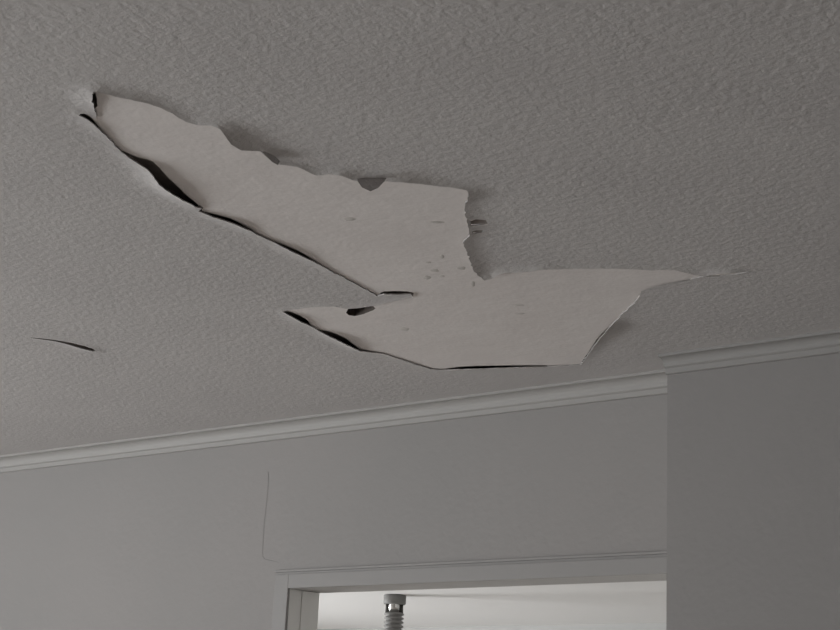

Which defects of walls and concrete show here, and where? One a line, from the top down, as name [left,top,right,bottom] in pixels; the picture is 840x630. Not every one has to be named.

crack [34,337,109,354]
peeling [64,77,759,372]